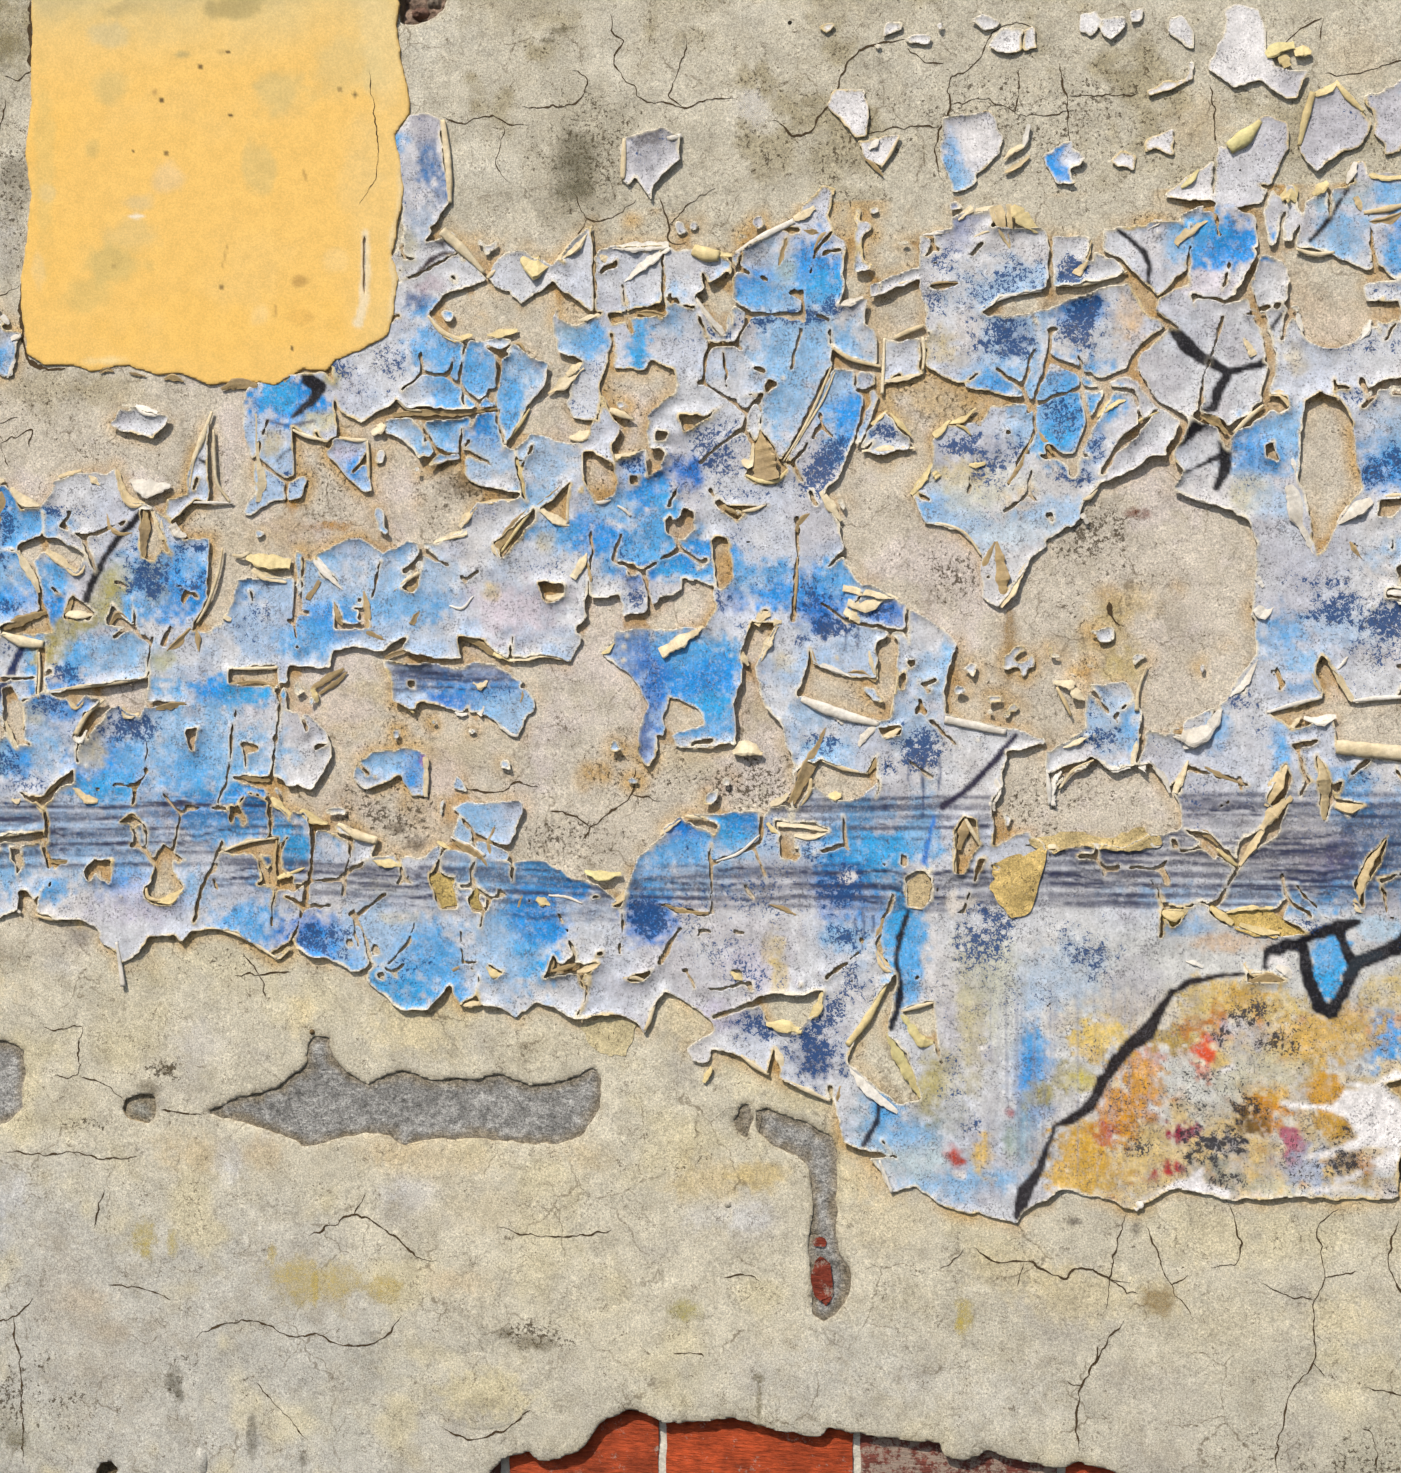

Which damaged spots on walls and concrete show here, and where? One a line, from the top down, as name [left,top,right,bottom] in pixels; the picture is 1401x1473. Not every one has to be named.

crack [444,14,729,183]
crack [772,22,1135,185]
peeling [972,14,1037,53]
peeling [1079,8,1143,40]
peeling [1208,3,1312,99]
crack [0,284,65,371]
peeling [0,79,1401,1224]
crack [312,1195,436,1261]
spalling [734,1104,851,1321]
crack [203,1317,401,1347]
crack [941,1203,1401,1473]
flaking render [491,1410,1115,1473]